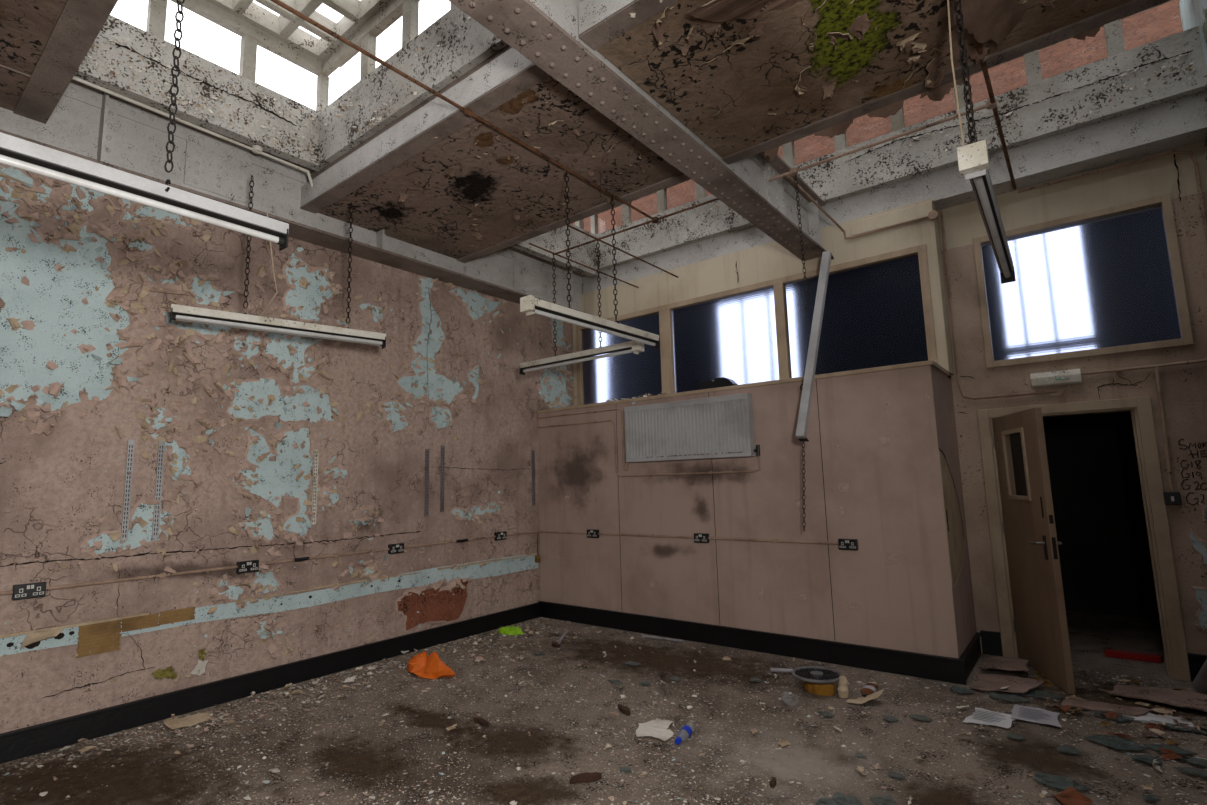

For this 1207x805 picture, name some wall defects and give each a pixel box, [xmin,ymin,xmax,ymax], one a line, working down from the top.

peeling [950,0,1056,65]
peeling [1073,27,1100,41]
peeling [868,32,964,118]
peeling [814,119,854,138]
peeling [0,164,577,676]
spalling [939,448,964,587]
peeling [846,689,884,704]